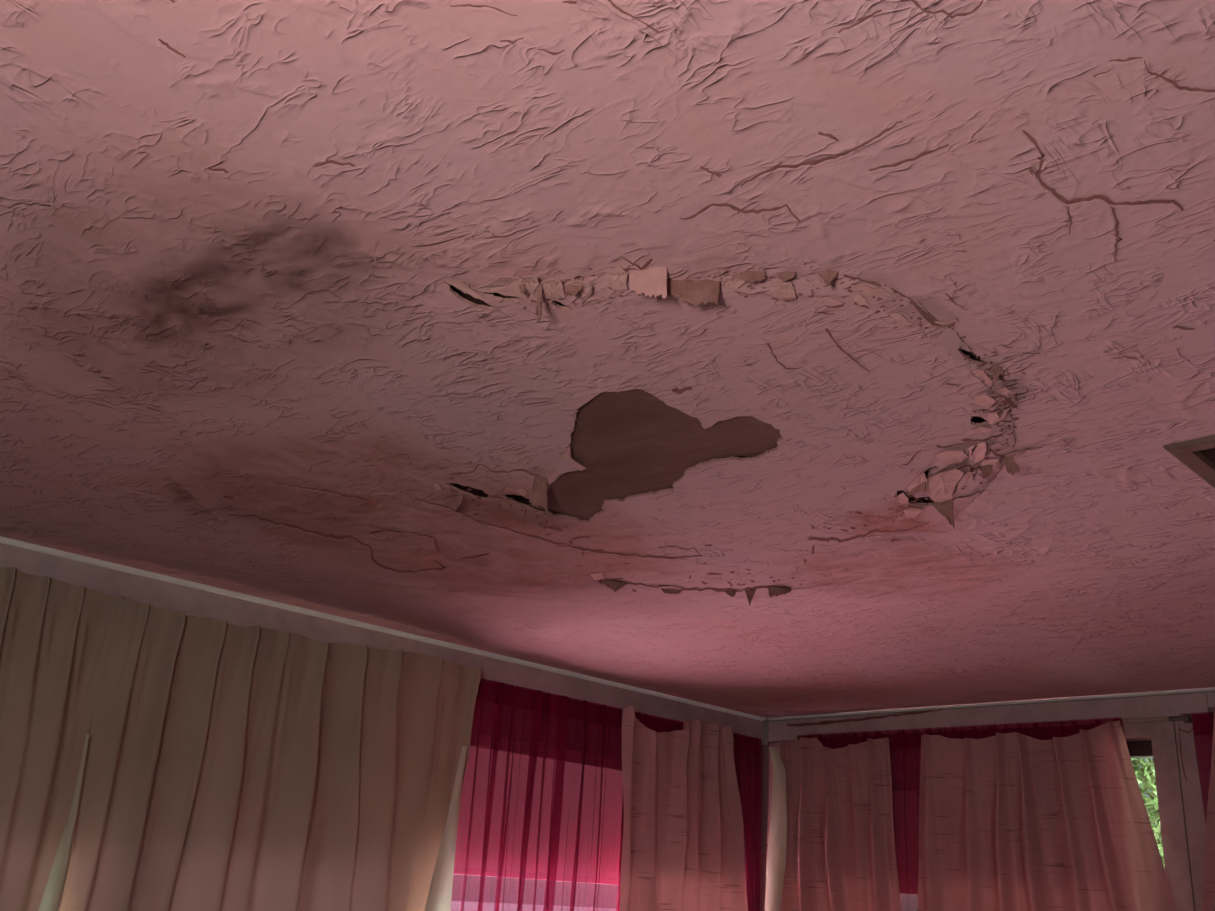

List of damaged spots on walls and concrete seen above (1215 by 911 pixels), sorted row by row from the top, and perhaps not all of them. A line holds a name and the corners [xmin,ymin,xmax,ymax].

crack [1093,57,1215,96]
crack [679,121,950,224]
crack [1020,130,1184,261]
peeling [518,389,781,520]